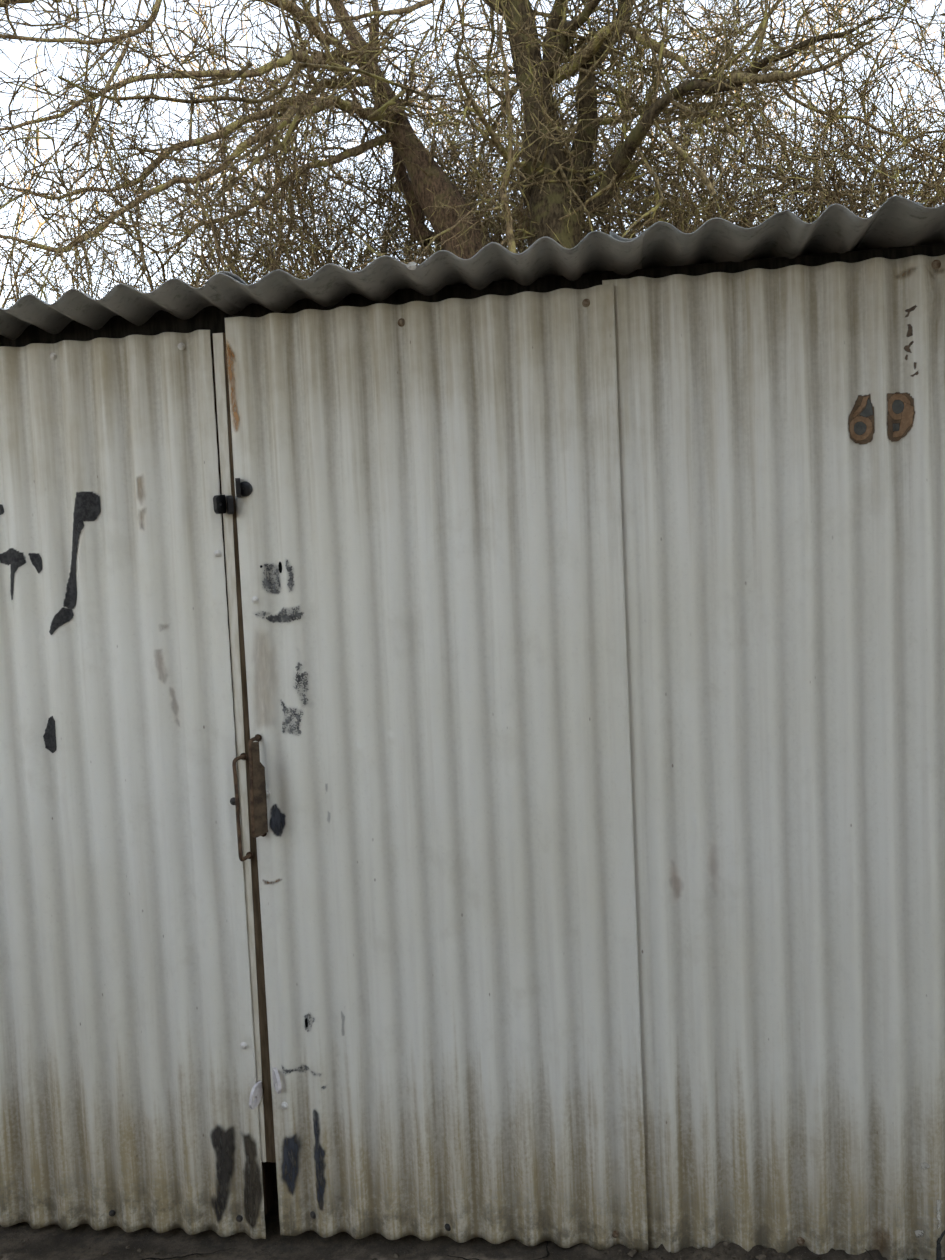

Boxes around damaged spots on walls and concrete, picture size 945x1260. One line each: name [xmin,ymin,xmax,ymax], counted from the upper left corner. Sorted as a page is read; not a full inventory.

peeling [0,548,42,600]
peeling [255,560,303,623]
peeling [281,663,308,736]
peeling [43,716,57,753]
peeling [281,1110,326,1210]